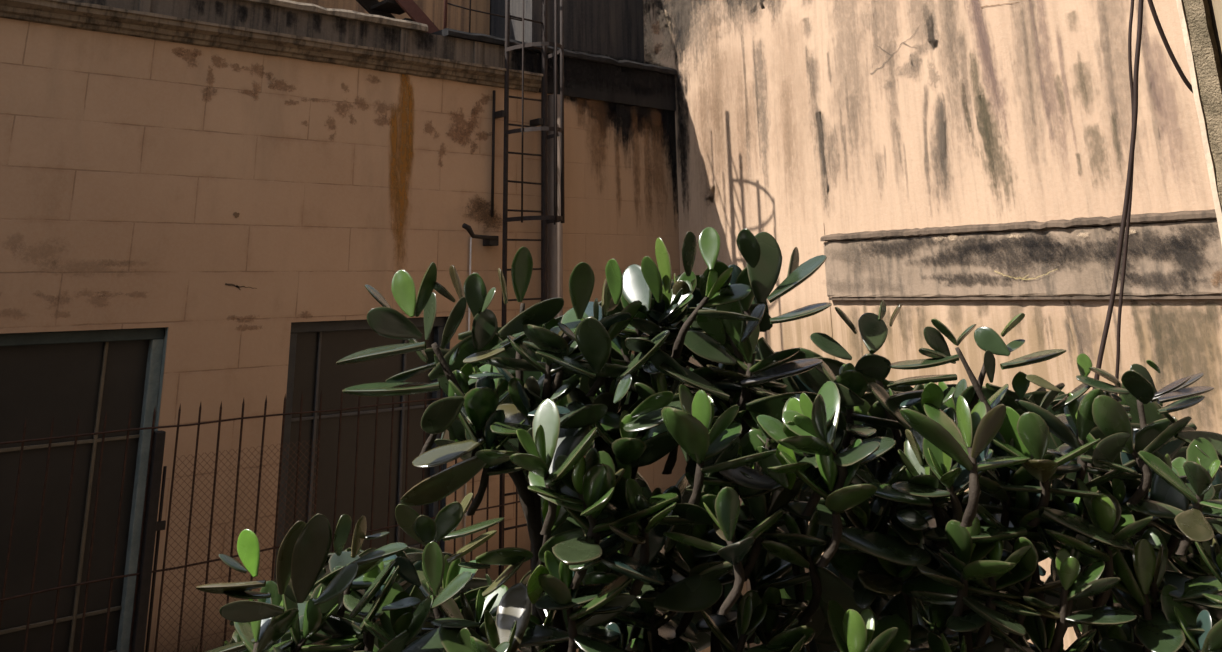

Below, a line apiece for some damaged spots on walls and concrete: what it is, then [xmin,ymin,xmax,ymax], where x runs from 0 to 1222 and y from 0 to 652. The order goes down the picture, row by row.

rust [390,74,414,257]
spalling [448,96,491,154]
water stain [511,0,757,212]
water stain [923,94,947,185]
water stain [963,0,1011,188]
water stain [863,225,1217,413]